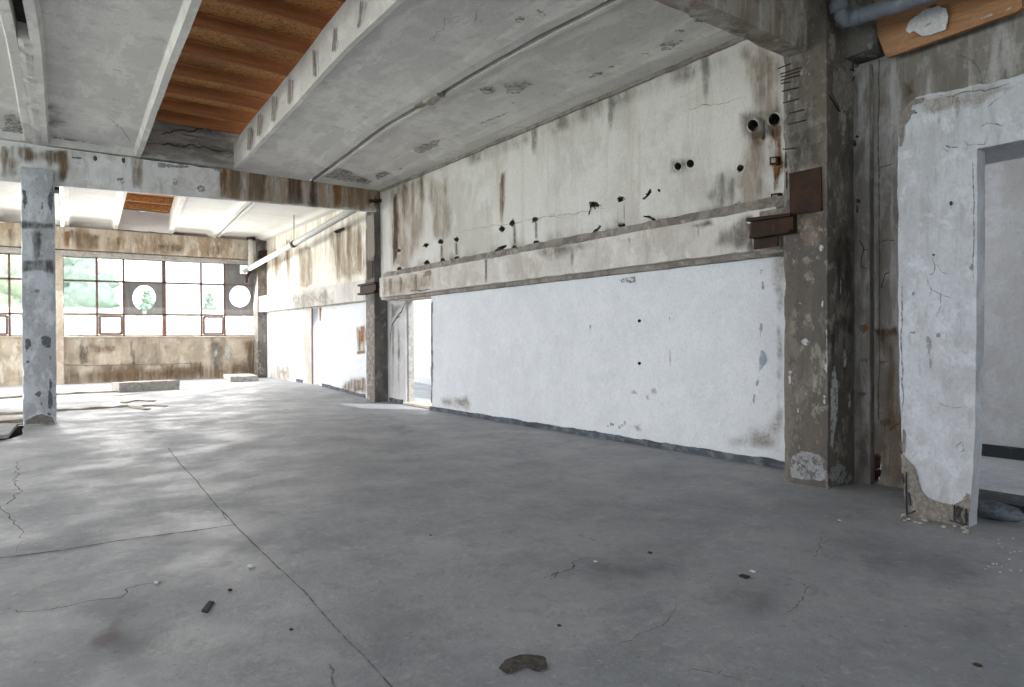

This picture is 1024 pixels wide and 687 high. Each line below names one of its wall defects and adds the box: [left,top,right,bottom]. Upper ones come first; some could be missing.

water stain [46,137,77,180]
crack [161,128,233,153]
spalling [898,97,924,147]
water stain [223,168,402,210]
water stain [384,182,449,317]
water stain [72,341,254,381]
spalling [790,451,852,484]
spalling [900,429,971,526]
crack [0,459,24,547]